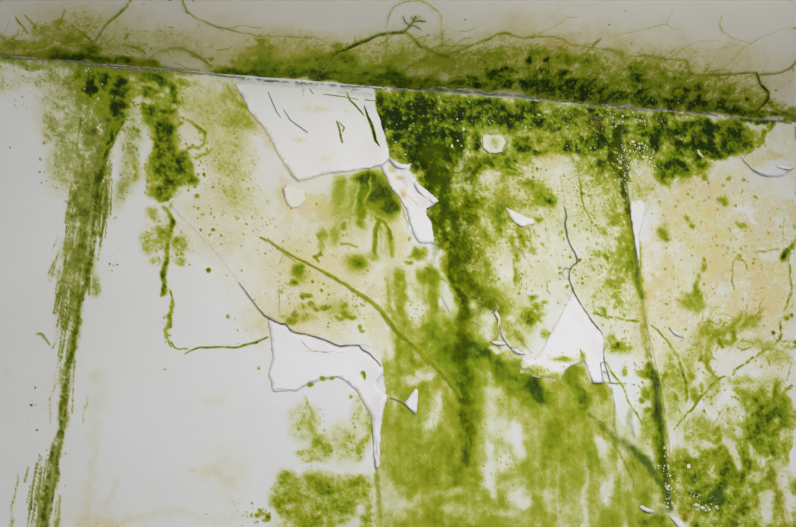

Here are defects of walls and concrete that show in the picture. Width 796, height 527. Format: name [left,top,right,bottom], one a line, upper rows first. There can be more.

crack [2,55,312,96]
peeling [235,81,438,243]
peeling [480,132,507,153]
crack [331,84,796,278]
leakage [0,10,268,527]
crack [239,283,382,367]
peeling [268,319,387,468]
peeling [405,389,418,413]
leakage [210,37,796,527]
peeling [491,292,607,383]
crack [559,207,611,382]
crack [646,319,672,458]